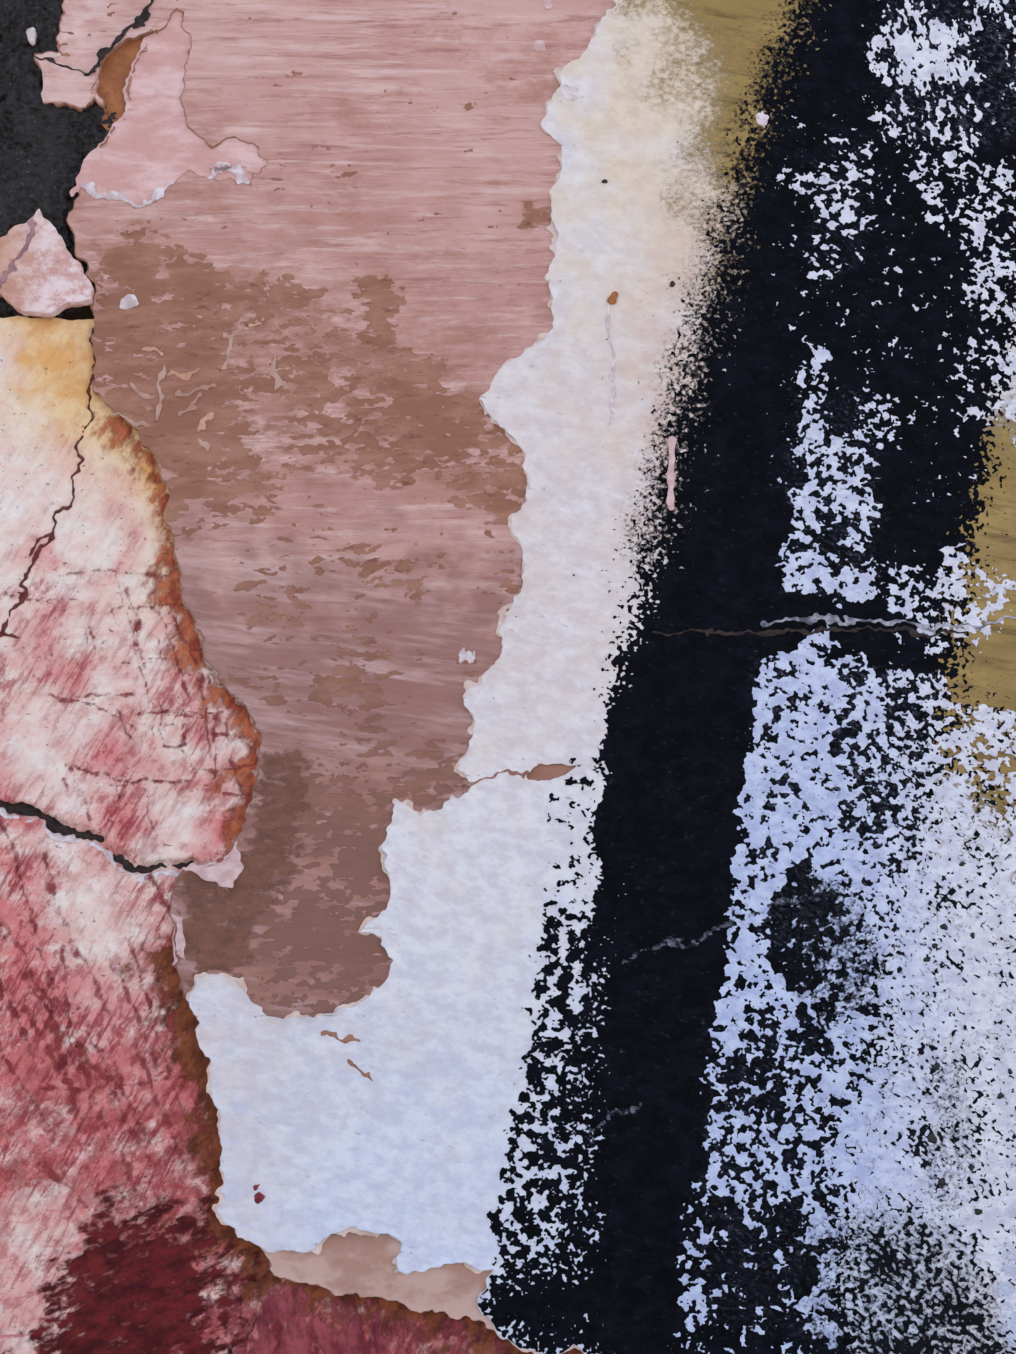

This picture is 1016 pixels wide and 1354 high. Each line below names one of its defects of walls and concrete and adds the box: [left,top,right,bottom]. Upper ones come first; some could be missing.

crack [34,0,154,76]
peeling [755,111,769,128]
crack [0,328,96,638]
crack [652,613,1016,639]
spalling [0,0,629,1354]
crack [0,800,194,882]